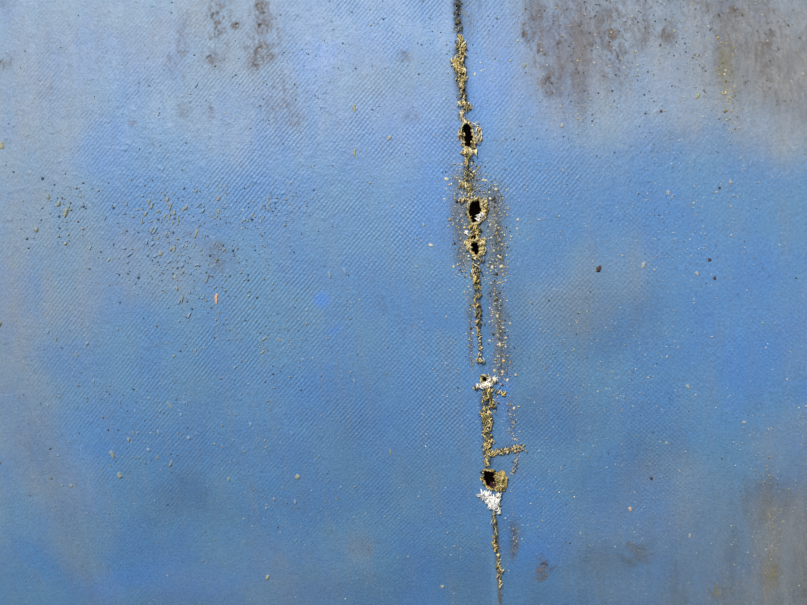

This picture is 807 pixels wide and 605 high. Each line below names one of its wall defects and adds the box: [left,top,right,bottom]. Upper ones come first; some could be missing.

crack [450,0,474,123]
crack [458,152,476,199]
crack [468,255,485,364]
crack [478,388,527,476]
crack [490,510,504,595]